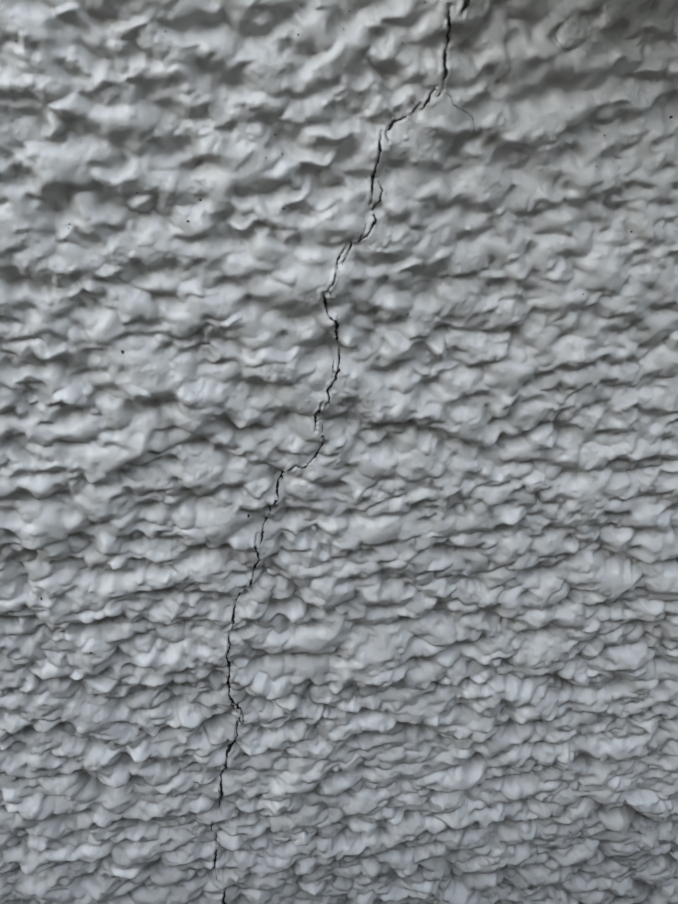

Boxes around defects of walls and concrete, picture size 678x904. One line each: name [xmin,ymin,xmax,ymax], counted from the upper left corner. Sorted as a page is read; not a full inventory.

crack [210,0,475,904]